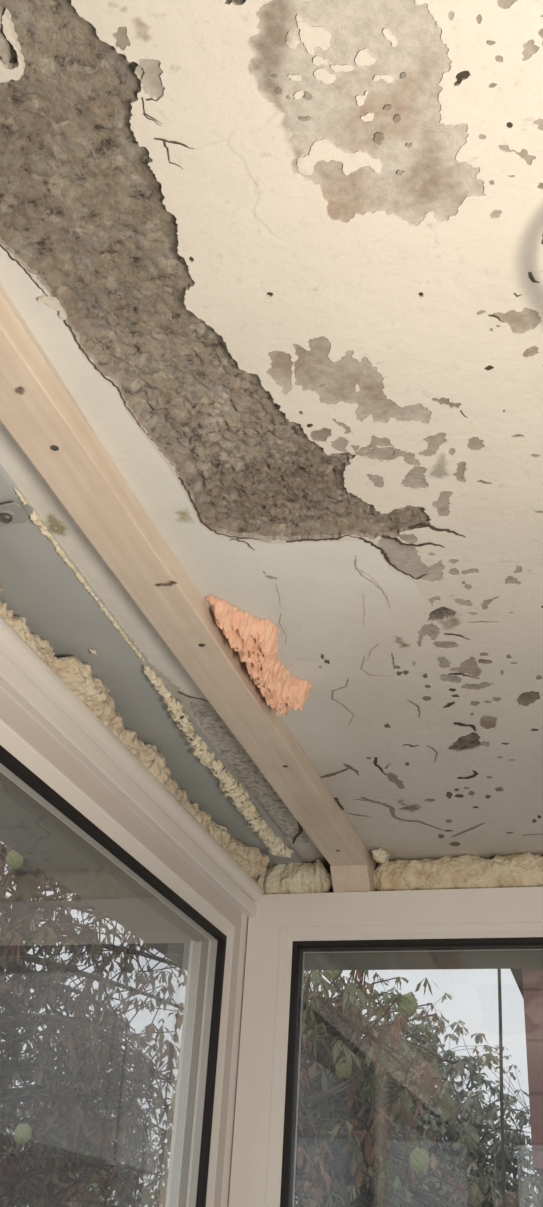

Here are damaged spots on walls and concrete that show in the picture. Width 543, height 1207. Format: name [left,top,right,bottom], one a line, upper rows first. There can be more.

crack [142,97,194,168]
crack [0,244,48,296]
crack [64,320,149,437]
spalling [0,0,543,716]
crack [179,477,466,725]
crack [402,700,479,779]
crack [453,716,498,731]
spalling [447,732,515,762]
crack [321,764,484,847]
spalling [446,776,504,809]